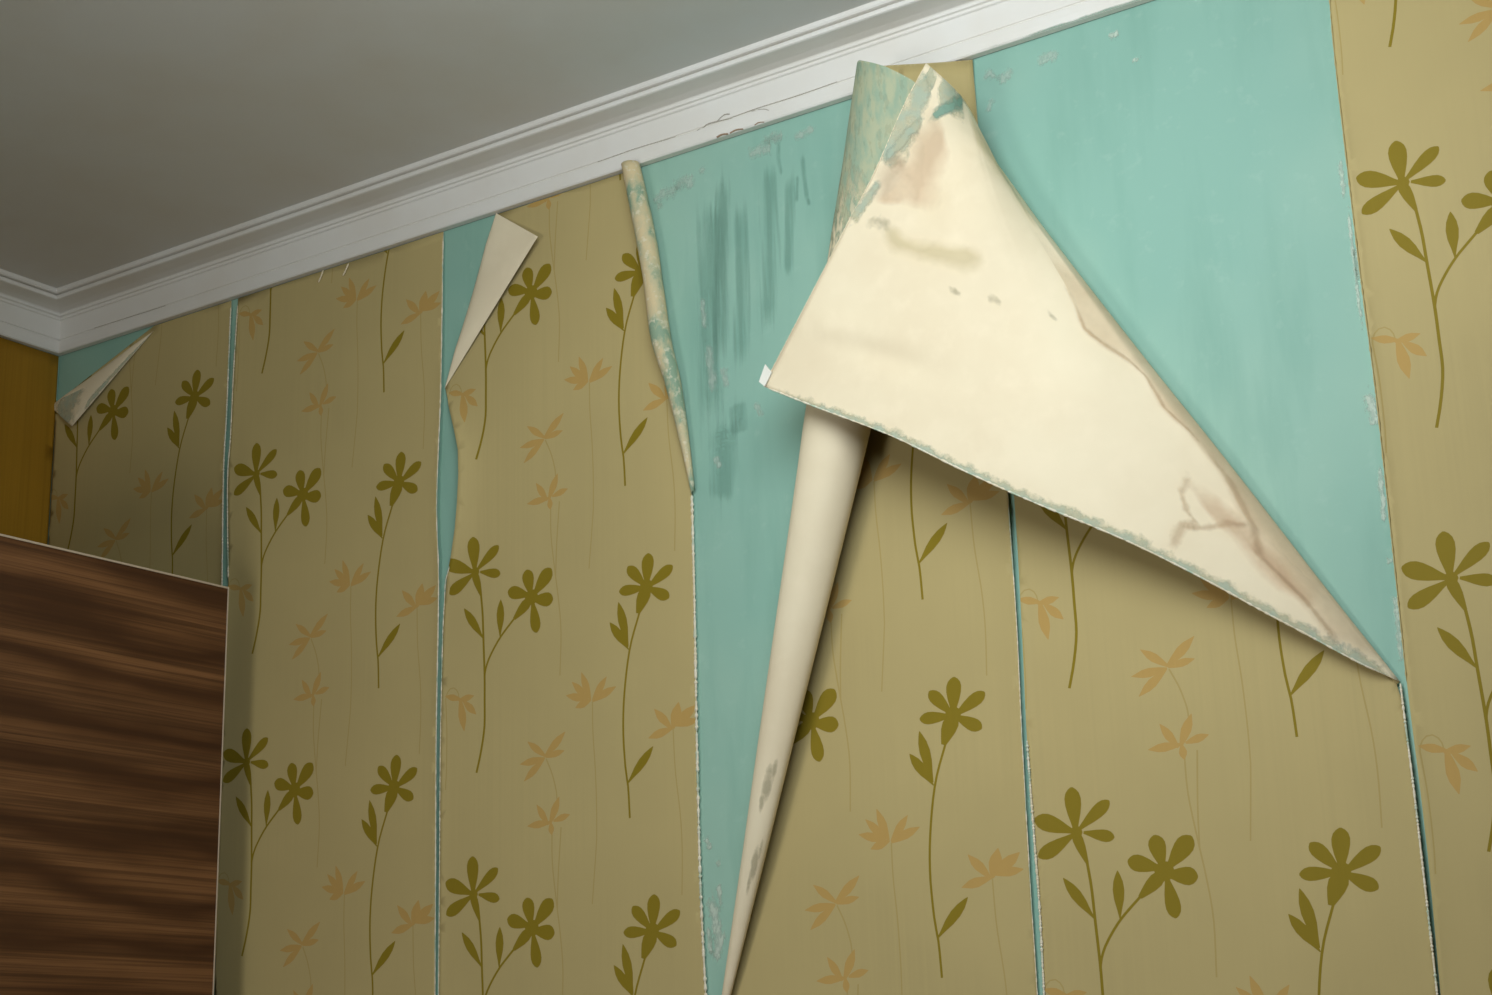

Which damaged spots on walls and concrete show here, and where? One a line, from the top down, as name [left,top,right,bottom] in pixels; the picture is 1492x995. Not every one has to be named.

peeling [1365,395,1378,425]